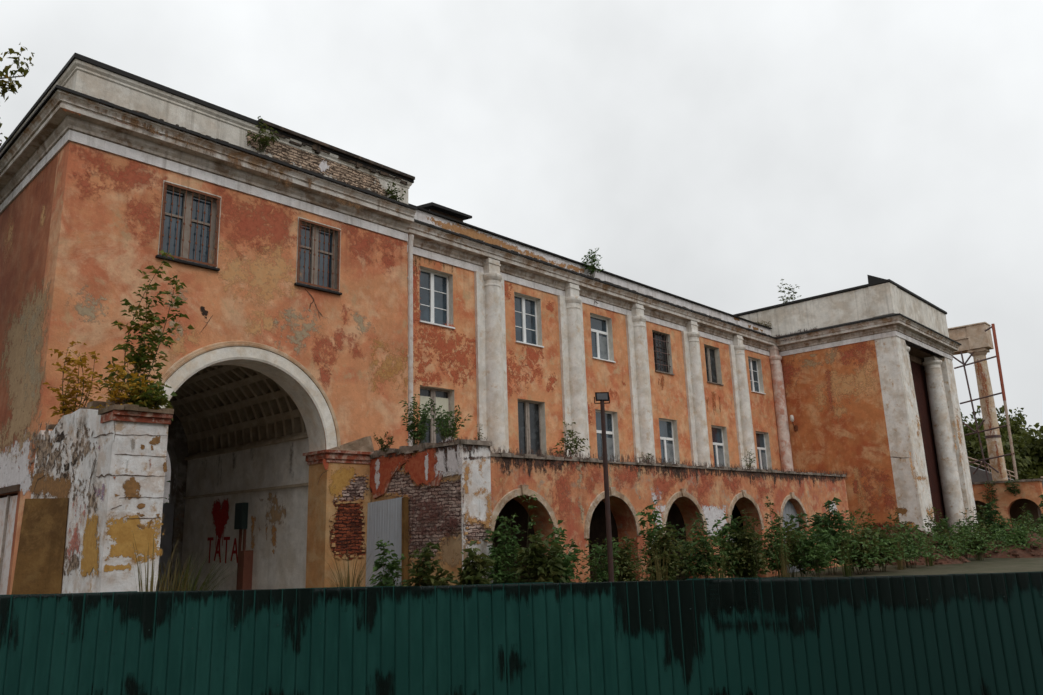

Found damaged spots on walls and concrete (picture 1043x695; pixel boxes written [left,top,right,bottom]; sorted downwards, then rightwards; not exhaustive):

spalling [247,119,415,196]
peeling [0,280,164,577]
spalling [329,437,492,566]